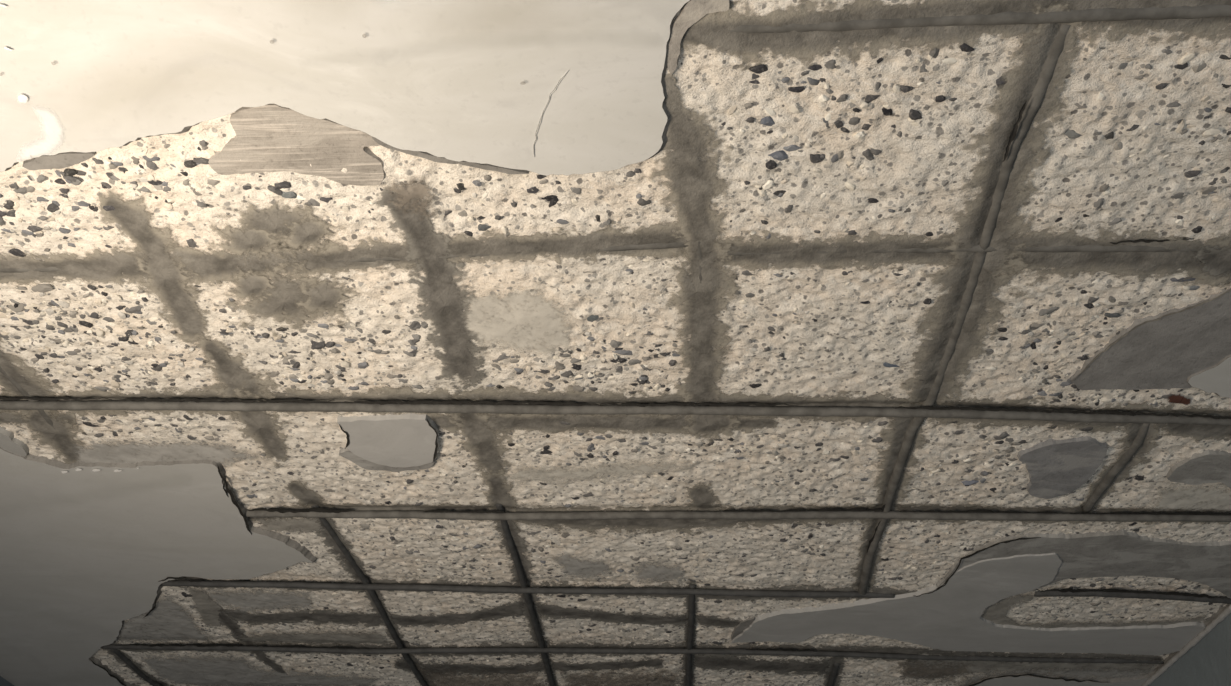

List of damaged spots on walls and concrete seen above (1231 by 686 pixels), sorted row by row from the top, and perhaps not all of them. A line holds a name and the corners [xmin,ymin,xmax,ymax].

spalling [0,5,1037,261]
crack [533,70,569,149]
water stain [0,0,1231,417]
spalling [729,0,855,18]
spalling [873,0,925,8]
spalling [1006,23,1231,244]
spalling [0,253,1231,686]
water stain [101,413,1231,686]